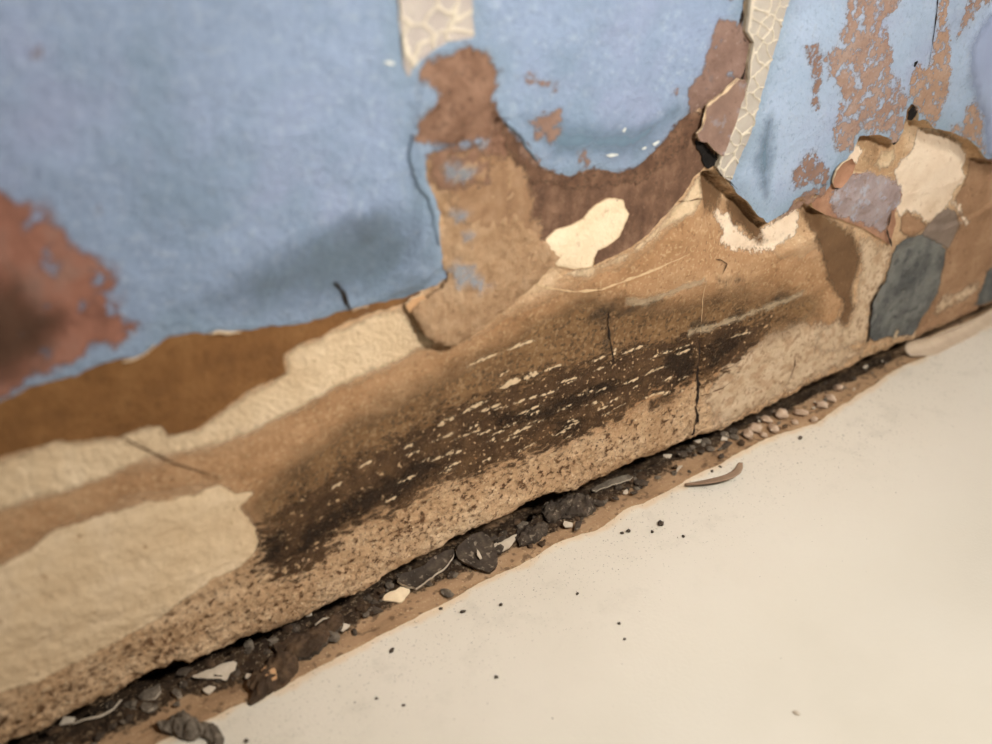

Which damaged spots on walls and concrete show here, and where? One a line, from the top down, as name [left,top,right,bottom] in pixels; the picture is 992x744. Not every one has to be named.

crack [397,0,475,76]
peeling [414,18,829,277]
crack [714,0,790,189]
flaking render [805,0,992,356]
peeling [0,191,435,511]
crack [692,259,734,435]
crack [120,435,221,478]
water stain [0,195,861,738]
flaking render [0,485,259,692]